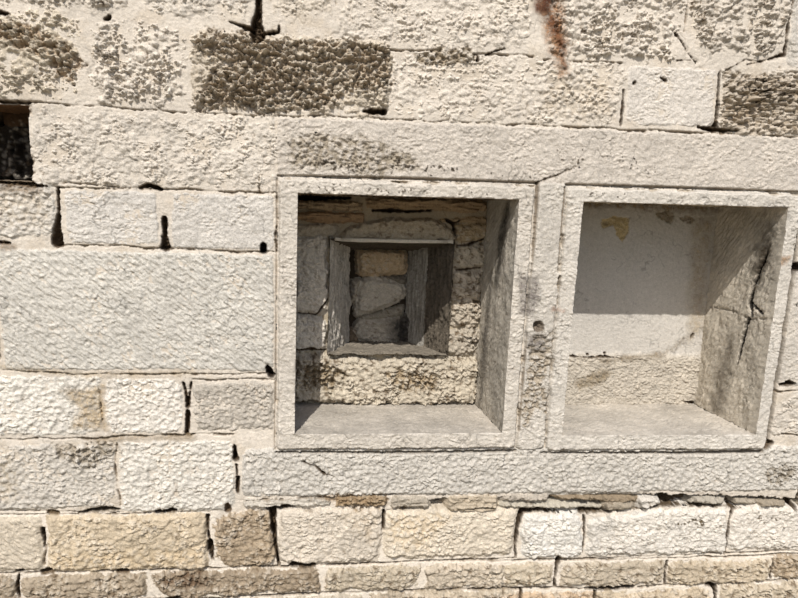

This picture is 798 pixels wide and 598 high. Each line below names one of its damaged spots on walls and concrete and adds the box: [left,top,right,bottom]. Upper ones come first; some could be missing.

rust [536,0,566,74]
crack [736,258,764,366]